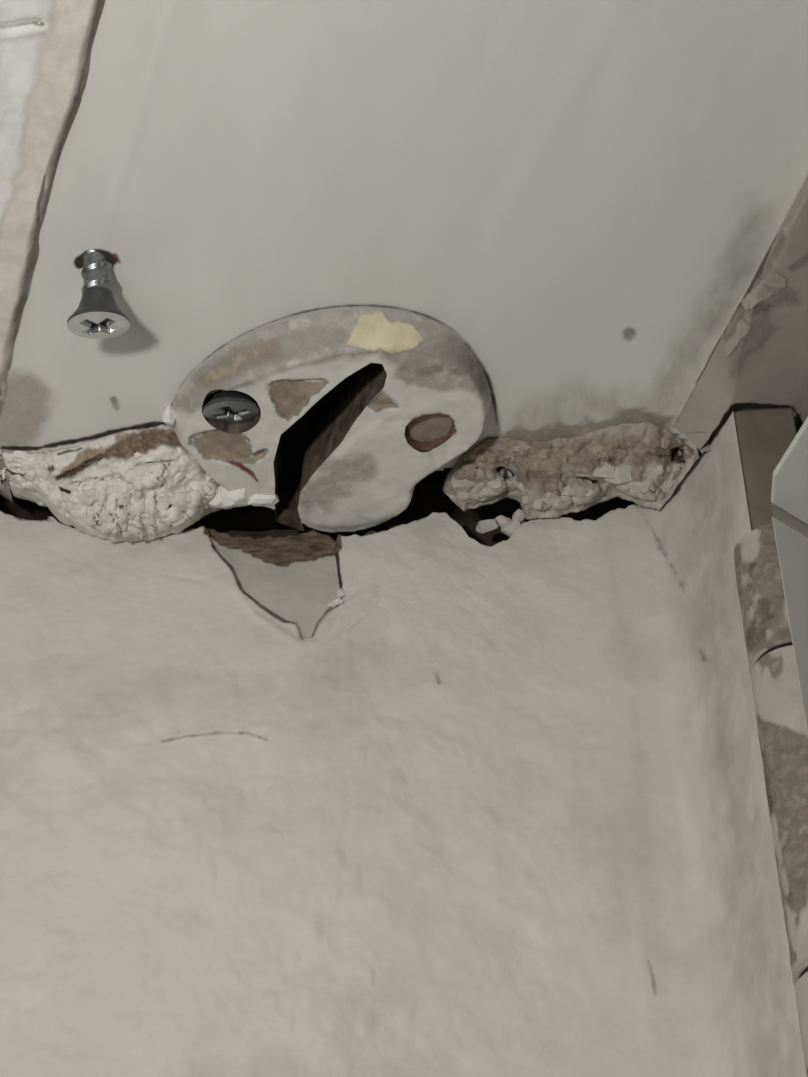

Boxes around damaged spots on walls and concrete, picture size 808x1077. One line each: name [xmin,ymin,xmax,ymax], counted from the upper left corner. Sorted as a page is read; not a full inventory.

spalling [0,425,345,638]
spalling [443,410,701,519]
peeling [734,523,792,675]
peeling [757,715,808,965]